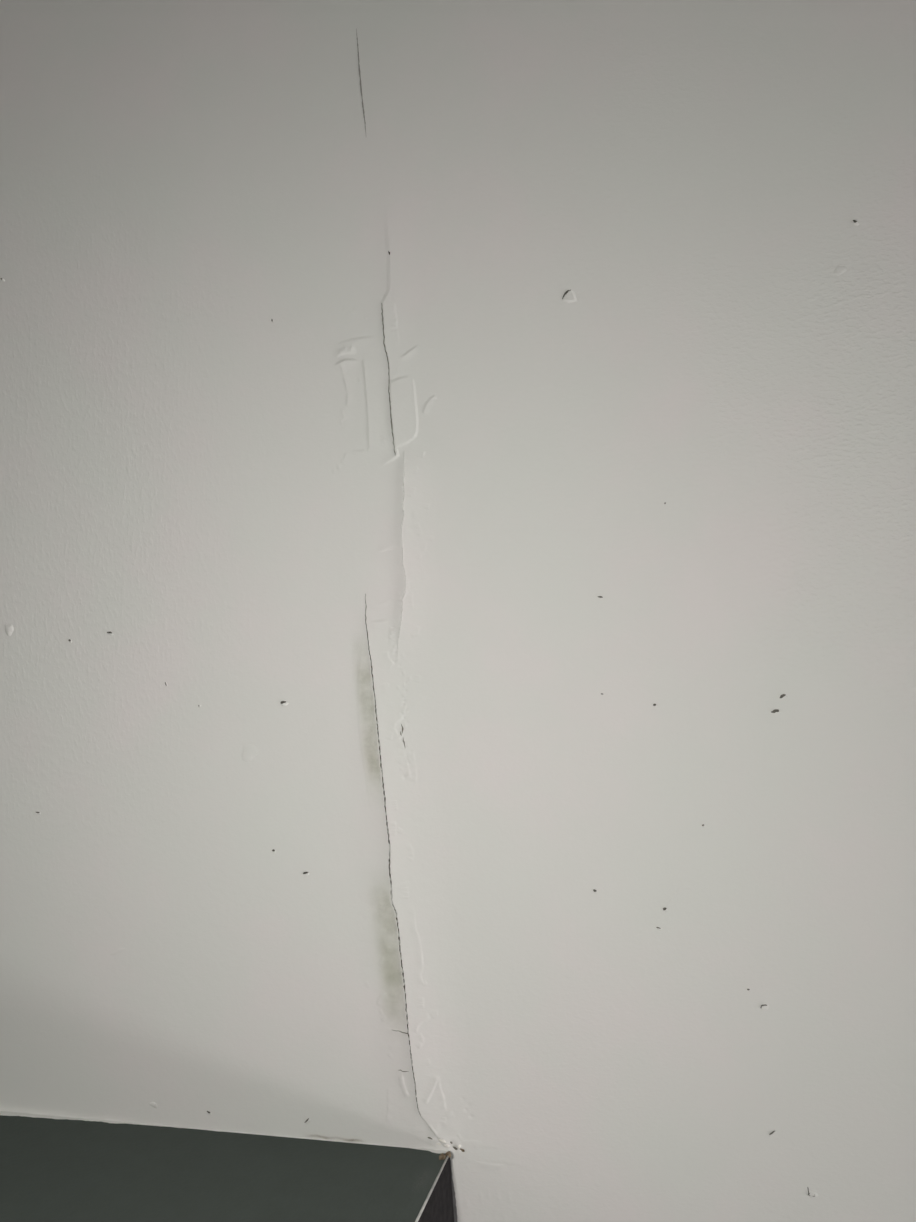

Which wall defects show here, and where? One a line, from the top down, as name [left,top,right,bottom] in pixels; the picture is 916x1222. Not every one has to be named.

crack [356,29,366,132]
crack [345,594,488,1146]